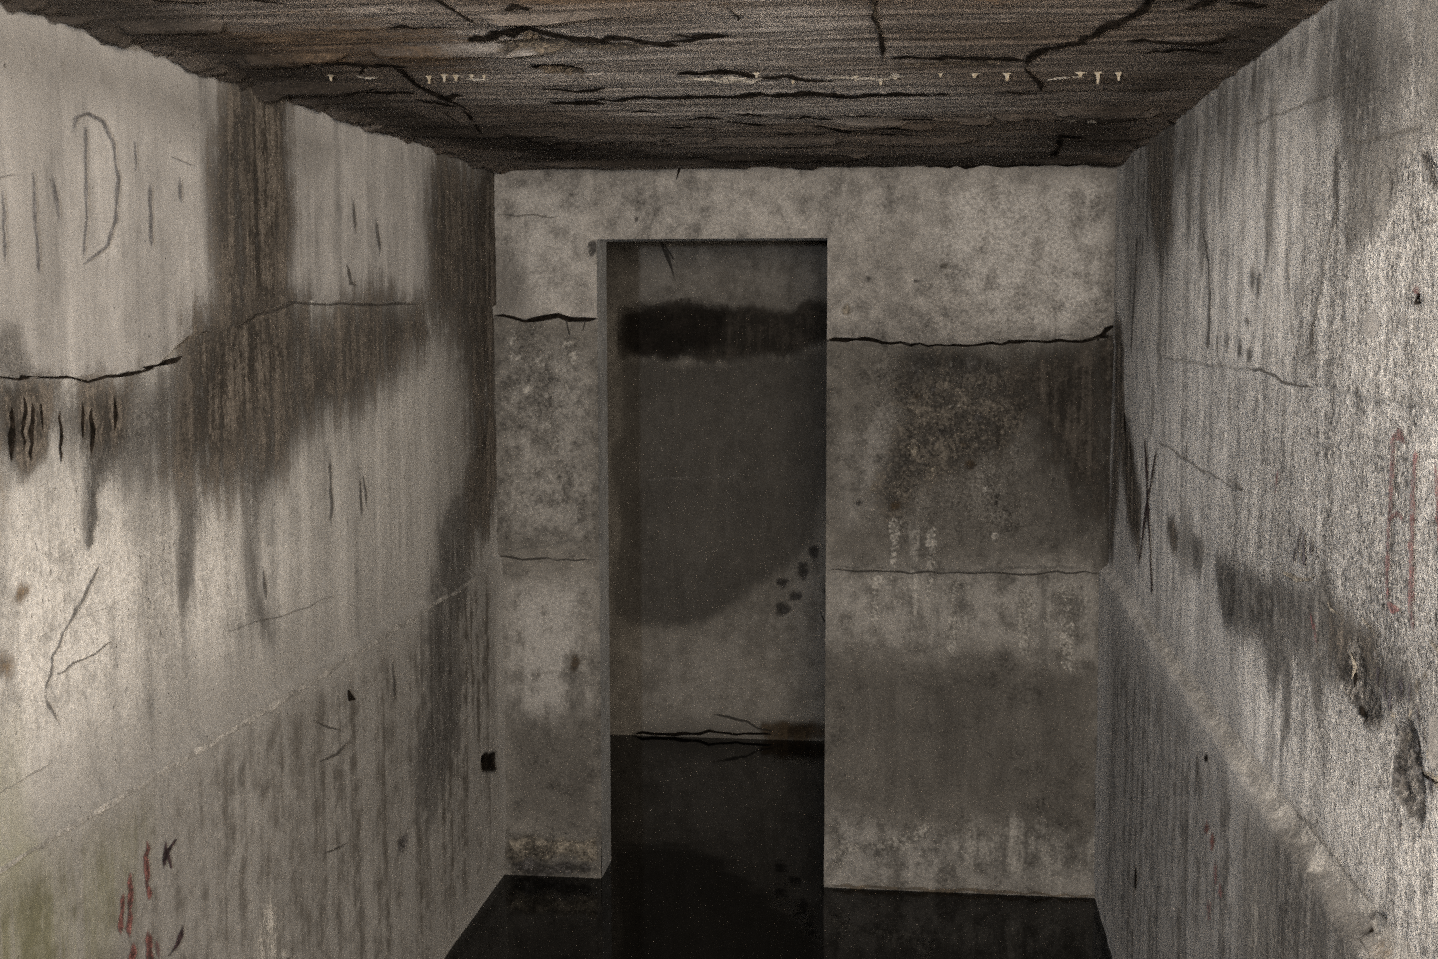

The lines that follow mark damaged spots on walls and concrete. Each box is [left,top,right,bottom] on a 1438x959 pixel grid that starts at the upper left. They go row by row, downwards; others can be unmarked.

crack [153,0,208,8]
crack [386,0,1270,105]
crack [322,62,486,140]
crack [823,135,1086,169]
crack [495,313,597,335]
crack [0,356,181,383]
water stain [0,0,1286,841]
peeling [1282,524,1317,582]
water stain [1167,519,1415,746]
crack [636,714,774,736]
spalling [1336,617,1438,838]
water stain [257,895,277,959]